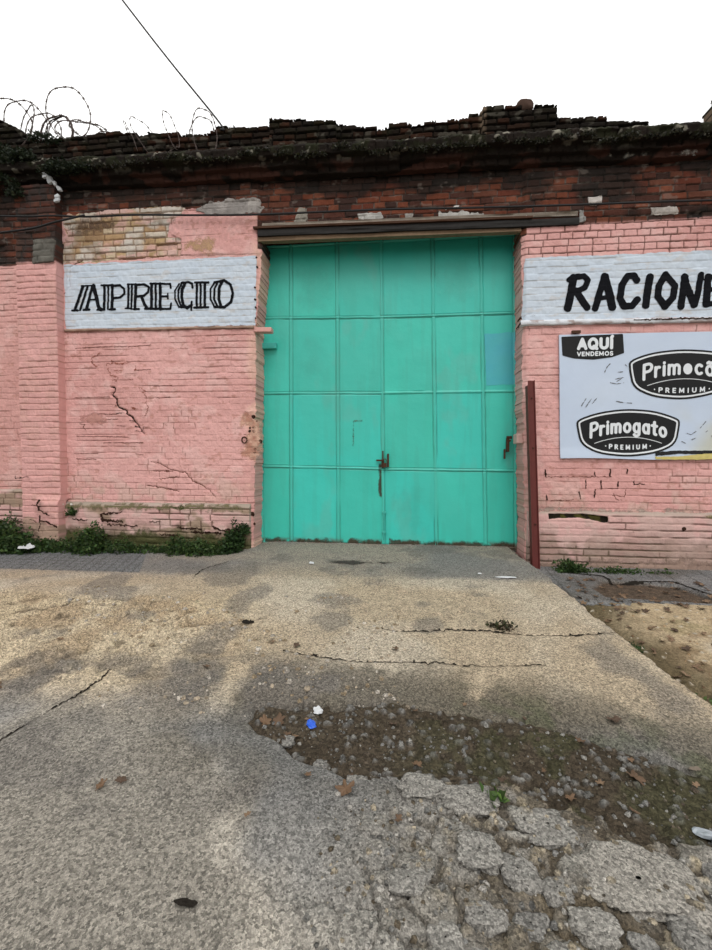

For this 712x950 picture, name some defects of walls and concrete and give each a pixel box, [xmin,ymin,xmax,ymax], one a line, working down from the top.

flaking render [63,206,185,264]
crack [75,343,148,351]
crack [74,387,213,494]
crack [30,499,230,537]
crack [0,669,111,741]